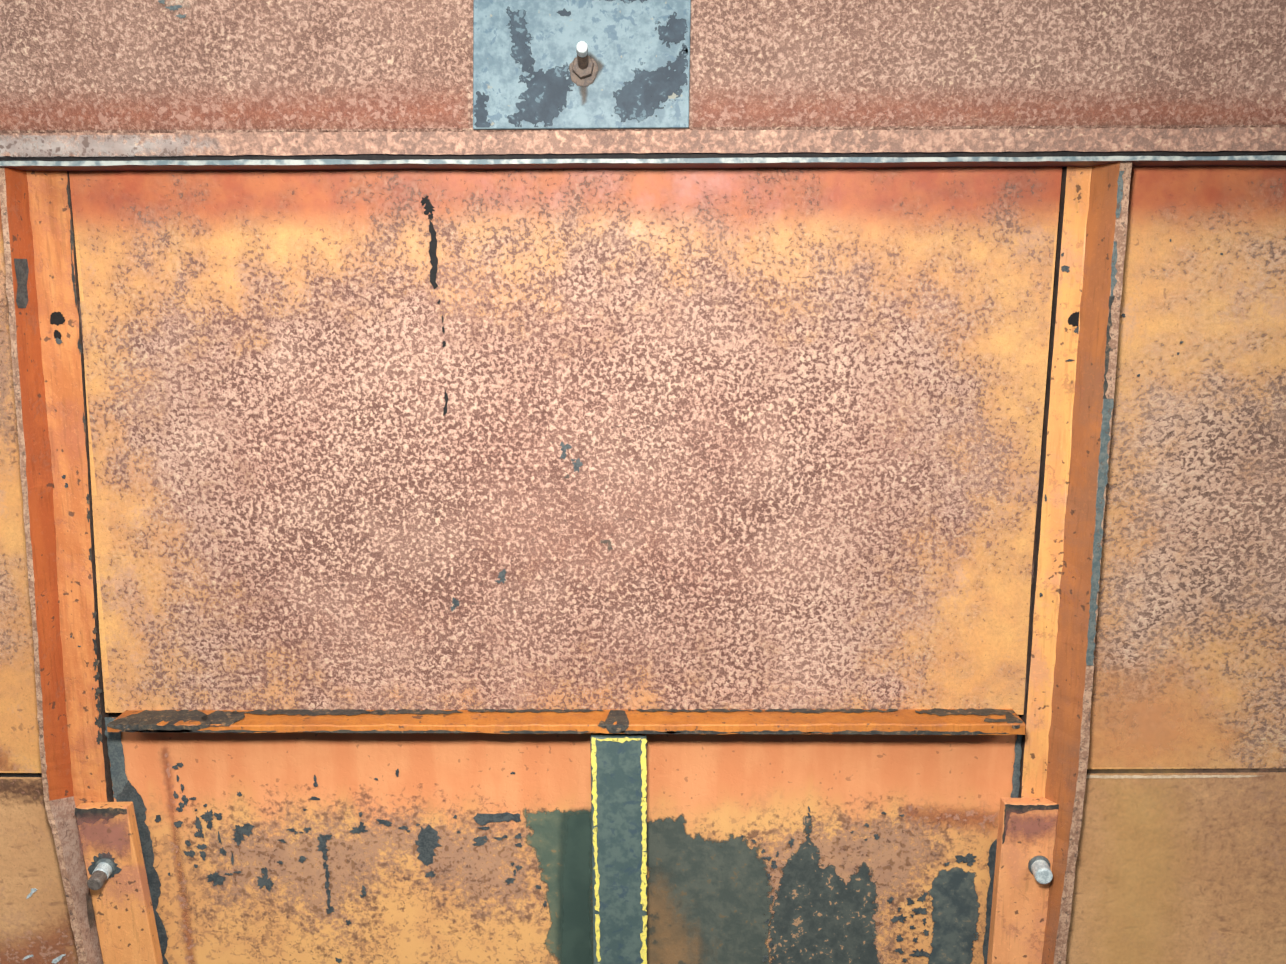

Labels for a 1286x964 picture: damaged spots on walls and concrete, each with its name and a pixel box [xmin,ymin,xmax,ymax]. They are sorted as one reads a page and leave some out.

rust [1,94,459,126]
peeling [474,91,491,127]
peeling [506,7,574,127]
peeling [611,12,688,123]
peeling [66,182,78,311]
rust [1144,205,1286,316]
rust [80,168,1054,710]
rust [1091,328,1286,777]
peeling [70,611,1059,964]
rust [0,931,72,964]
rust [173,788,549,964]
rust [747,803,1058,964]